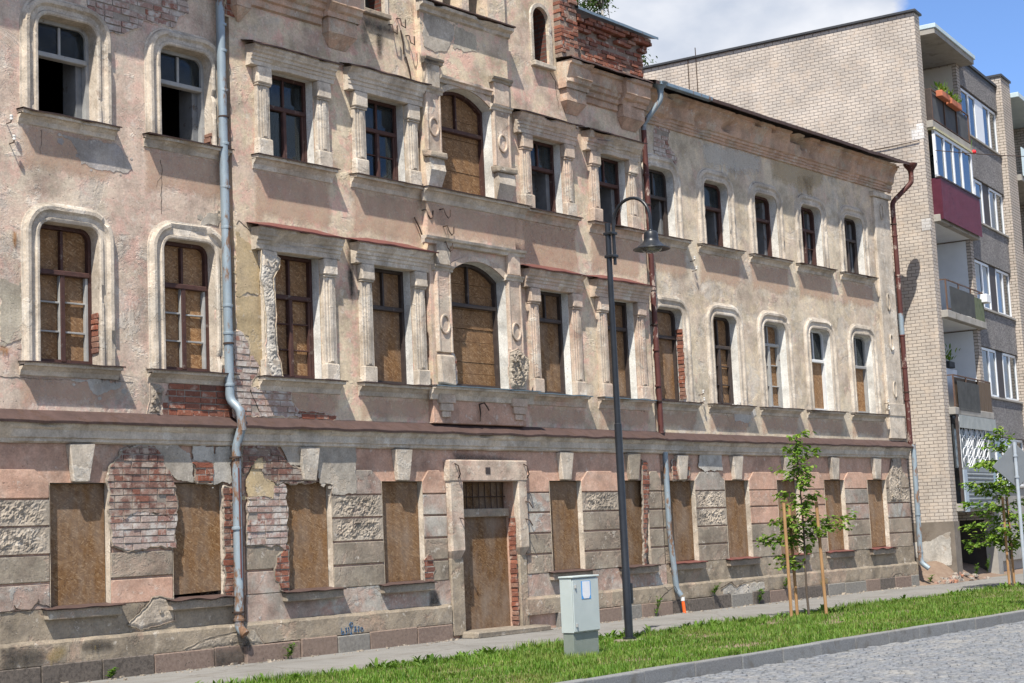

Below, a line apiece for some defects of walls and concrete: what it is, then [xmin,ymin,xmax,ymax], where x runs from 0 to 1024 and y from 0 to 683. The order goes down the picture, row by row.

flaking render [85,0,190,36]
flaking render [146,231,337,420]
flaking render [676,329,687,399]
spalling [128,595,176,631]
flaking render [105,444,357,595]
flaking render [422,553,436,581]
flaking render [508,516,520,625]
flaking render [641,460,650,565]